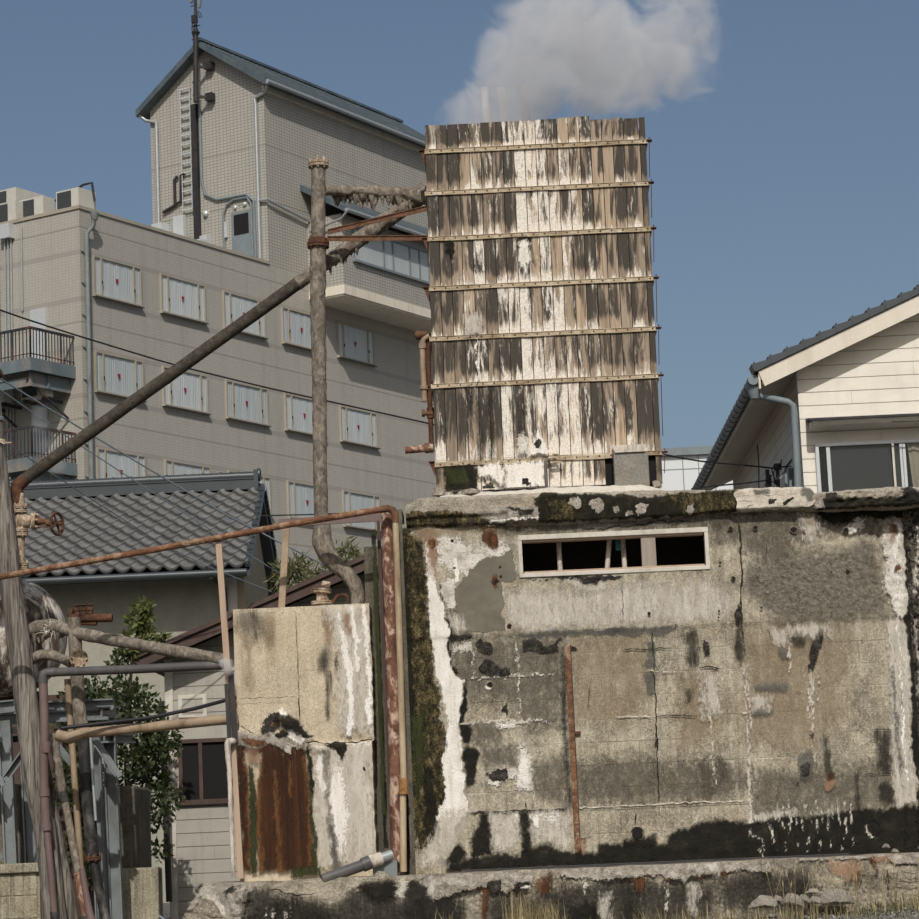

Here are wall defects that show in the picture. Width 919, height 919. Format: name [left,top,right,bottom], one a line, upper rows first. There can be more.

damp [515,236,532,272]
damp [445,339,551,489]
peeling [434,532,511,632]
rust [237,743,313,873]
damp [237,603,375,869]
spalling [452,639,510,688]
rust [565,644,586,854]
damp [403,508,919,919]
damp [241,877,466,919]